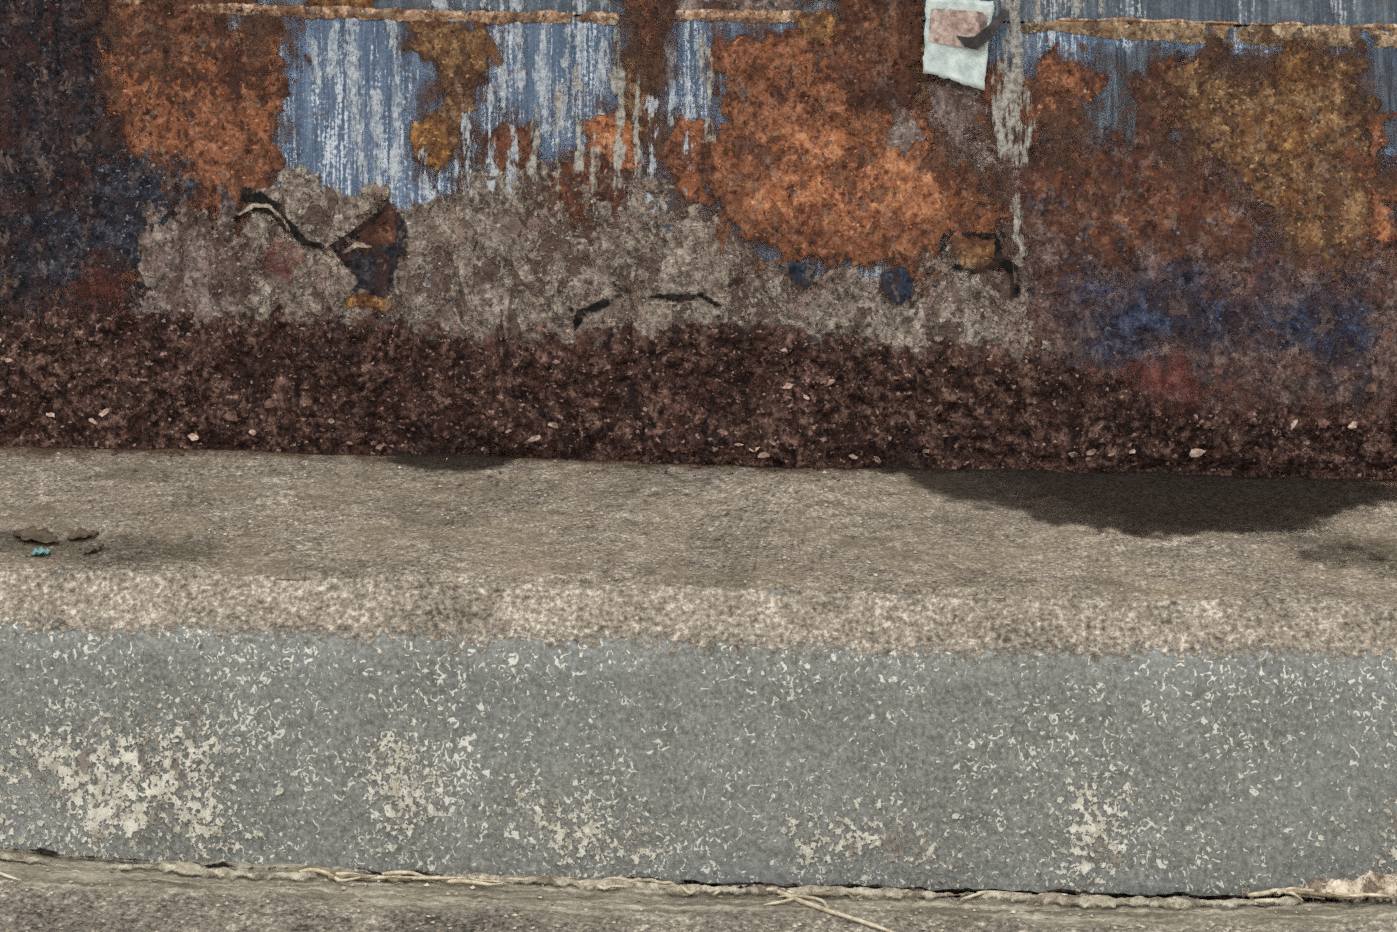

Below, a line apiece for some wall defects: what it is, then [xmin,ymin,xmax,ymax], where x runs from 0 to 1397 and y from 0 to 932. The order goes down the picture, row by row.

corrosion [0,258,174,346]
corrosion [79,0,376,238]
crack [233,186,384,267]
corrosion [402,10,542,190]
spalling [129,156,1052,367]
crack [556,278,746,331]
peeling [773,375,809,400]
corrosion [542,0,1110,356]
corrosion [1115,37,1397,290]